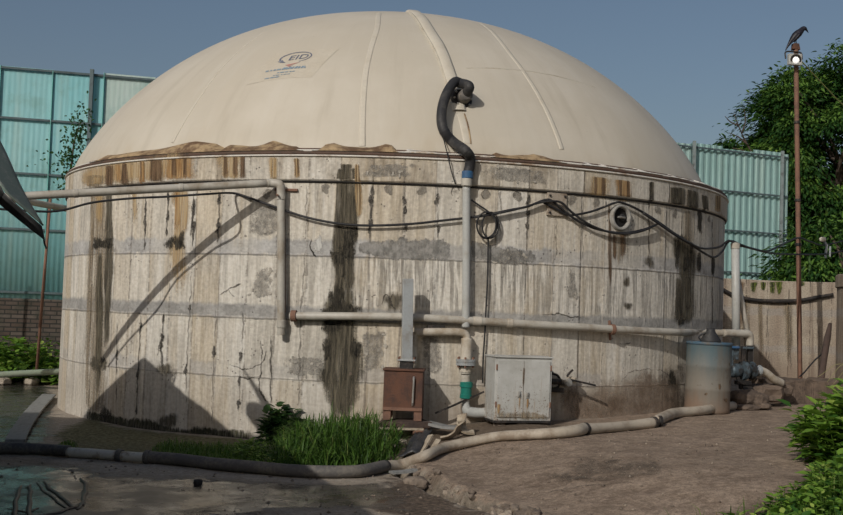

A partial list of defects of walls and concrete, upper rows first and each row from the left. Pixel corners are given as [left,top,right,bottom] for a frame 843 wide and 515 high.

water stain [85,176,113,423]
rust [82,154,193,283]
water stain [309,164,363,418]
rust [591,177,630,201]
rust [608,206,626,282]
water stain [671,187,709,325]
crack [115,314,164,414]
crack [183,305,191,401]
crack [212,315,272,408]